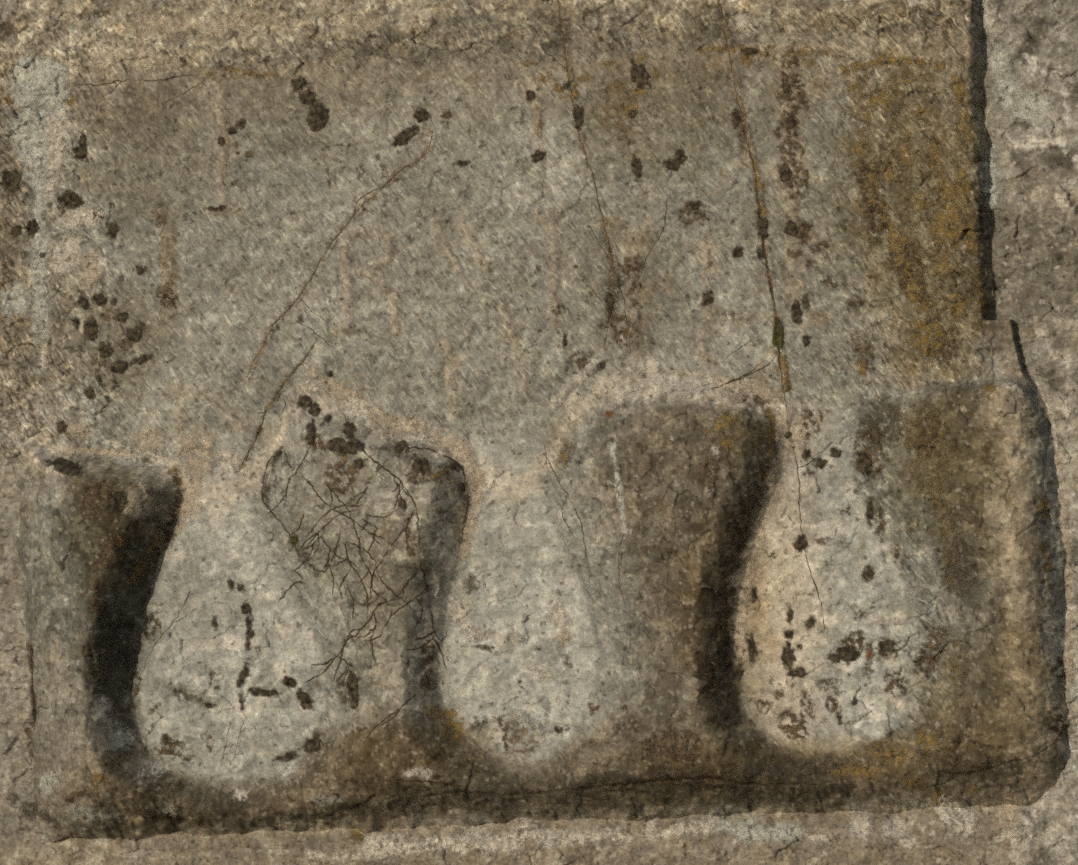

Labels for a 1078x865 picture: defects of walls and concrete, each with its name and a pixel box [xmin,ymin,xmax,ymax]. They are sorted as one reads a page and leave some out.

crack [236,131,447,683]
crack [410,447,469,545]
crack [544,0,668,353]
crack [711,0,825,630]
crack [365,694,416,740]